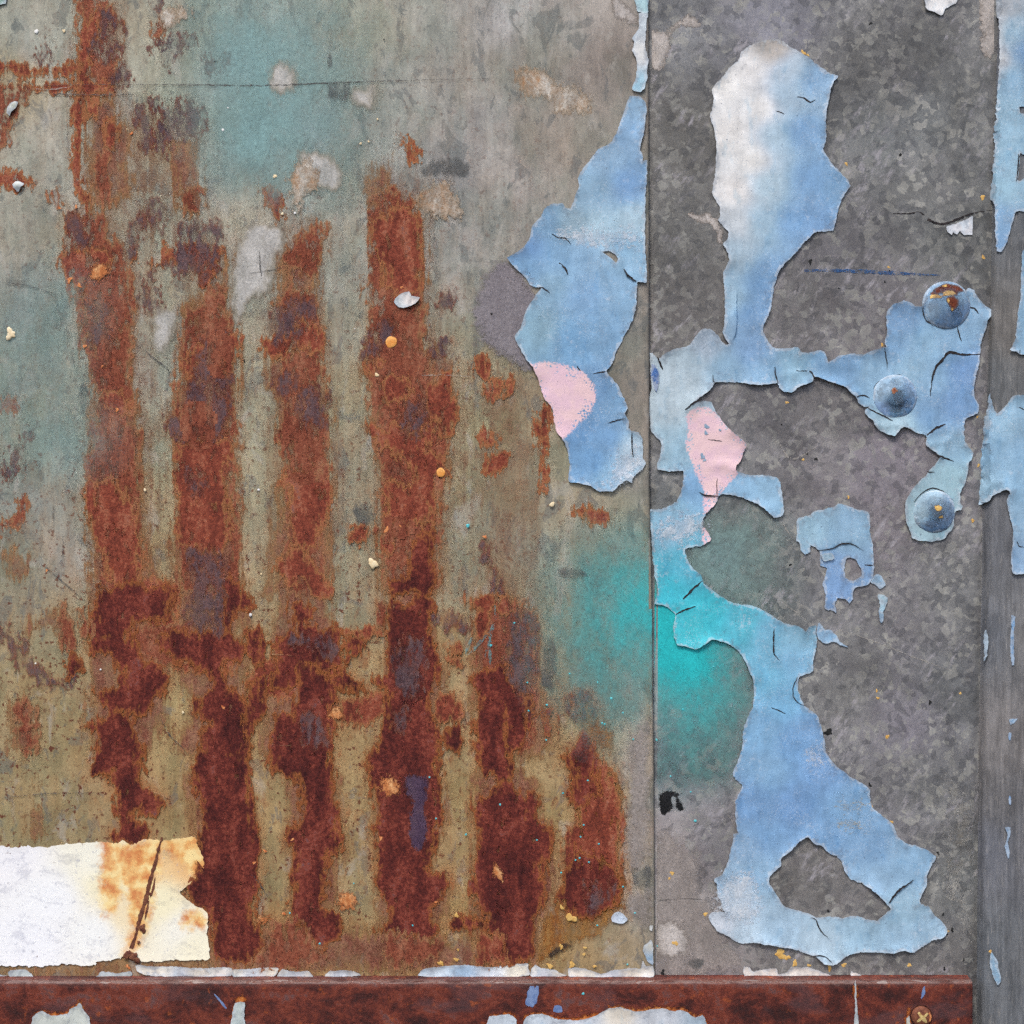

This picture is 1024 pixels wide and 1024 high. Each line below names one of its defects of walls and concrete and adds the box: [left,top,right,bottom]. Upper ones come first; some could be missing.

corrosion [0,0,627,976]
peeling [507,0,1024,976]
crack [123,837,163,964]
corrosion [34,999,91,1020]
corrosion [487,1005,708,1023]